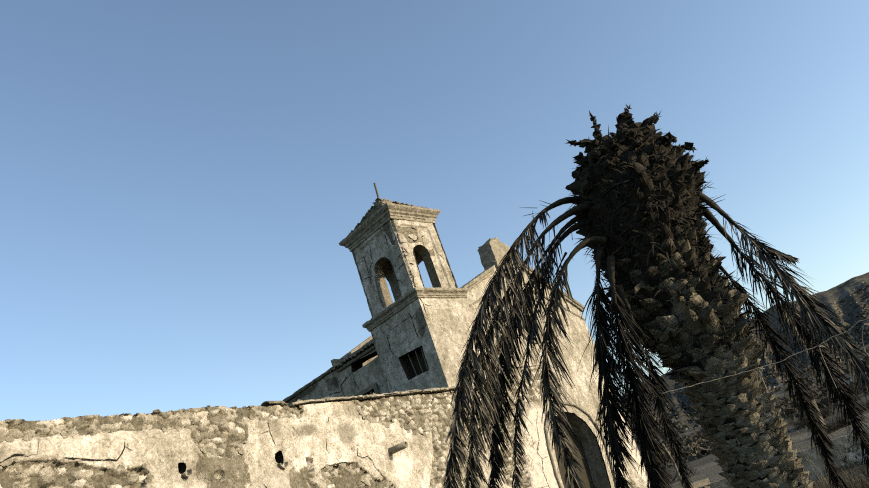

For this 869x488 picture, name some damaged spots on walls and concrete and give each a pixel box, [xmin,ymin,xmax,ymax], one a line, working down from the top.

spalling [0,399,304,488]
spalling [289,457,398,488]
spalling [354,366,553,488]